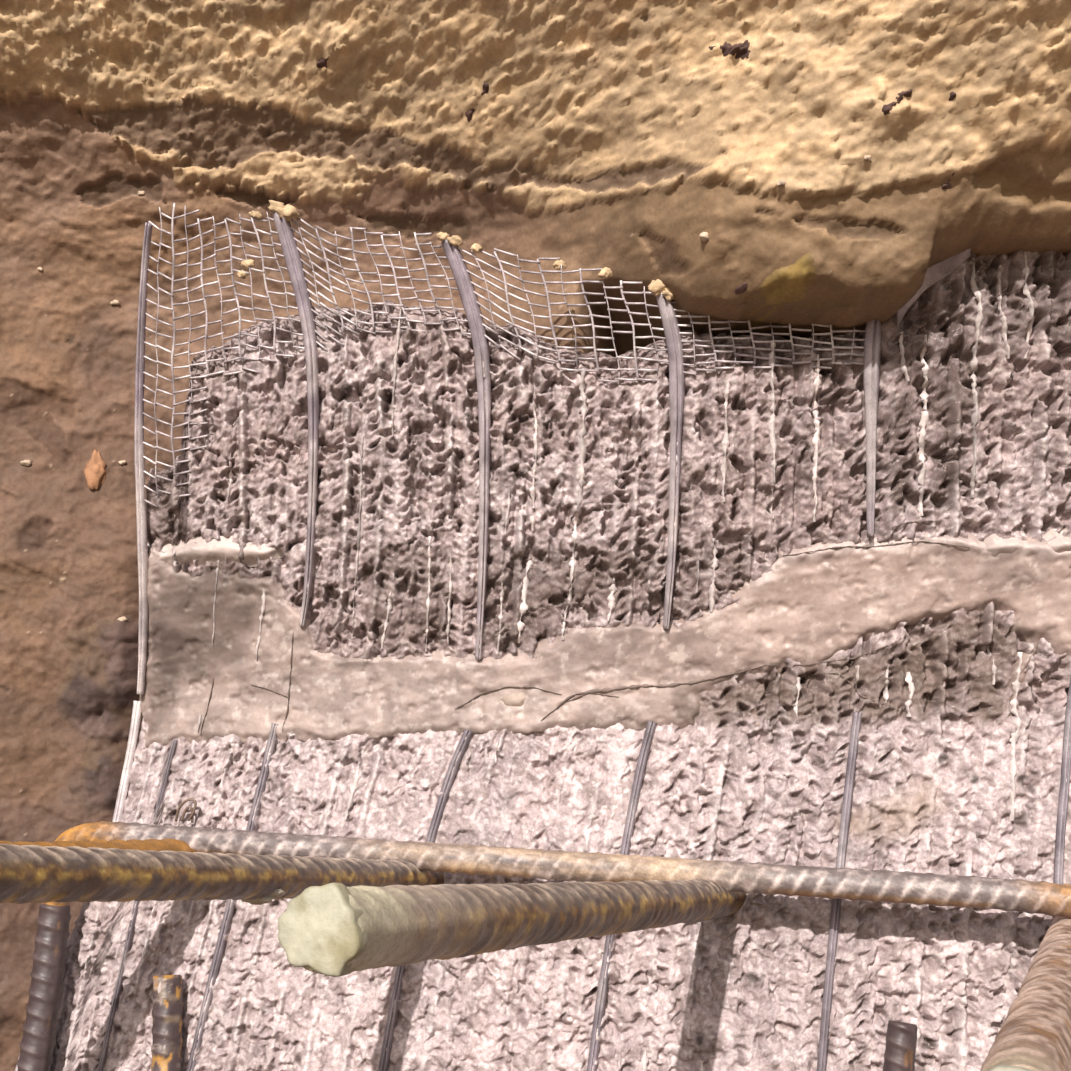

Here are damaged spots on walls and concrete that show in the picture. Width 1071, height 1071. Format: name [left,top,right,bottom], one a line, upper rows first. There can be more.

water stain [391,309,402,436]
water stain [529,386,538,531]
water stain [561,368,588,640]
water stain [721,381,730,502]
water stain [769,340,777,519]
water stain [811,354,821,522]
water stain [891,251,1071,516]
water stain [256,589,266,659]
water stain [381,591,392,649]
water stain [517,560,533,643]
water stain [607,576,618,621]
water stain [696,538,719,612]